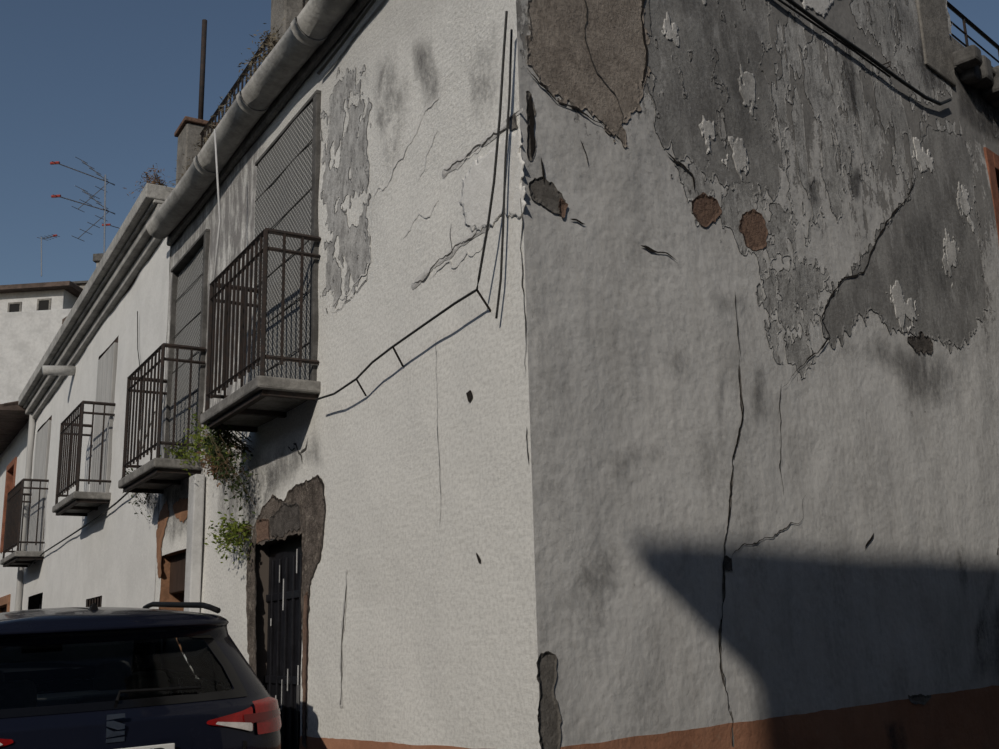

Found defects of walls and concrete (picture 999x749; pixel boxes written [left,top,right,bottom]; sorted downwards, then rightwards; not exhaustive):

peeling [320,64,372,314]
crack [411,221,496,290]
crack [442,91,536,178]
crack [519,186,527,372]
peeling [525,0,988,388]
spalling [156,498,188,578]
spalling [246,475,325,748]
crack [339,569,347,708]
spalling [536,651,562,749]
crack [718,295,804,748]